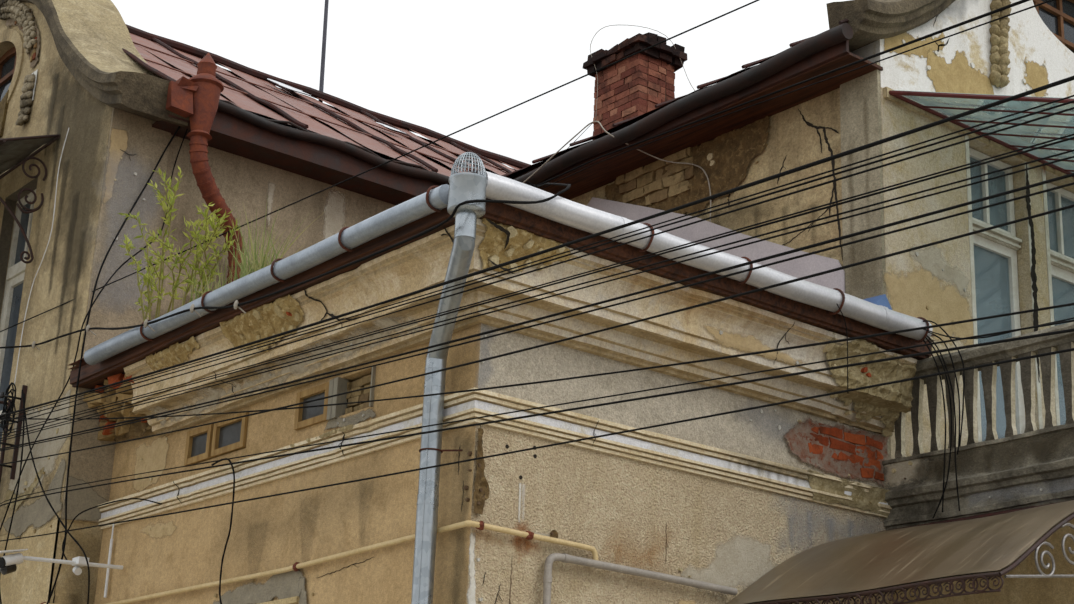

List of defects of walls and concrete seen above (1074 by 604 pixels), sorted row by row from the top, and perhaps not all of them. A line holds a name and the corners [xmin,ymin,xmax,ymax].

peeling [884,32,994,95]
peeling [1022,57,1049,97]
damp [45,73,106,379]
spalling [220,294,304,352]
spalling [478,218,571,273]
spalling [605,116,771,218]
crack [782,109,843,261]
crack [1026,164,1040,382]
peeling [4,390,71,510]
spalling [83,318,421,492]
spalling [463,428,490,515]
spalling [777,332,925,518]